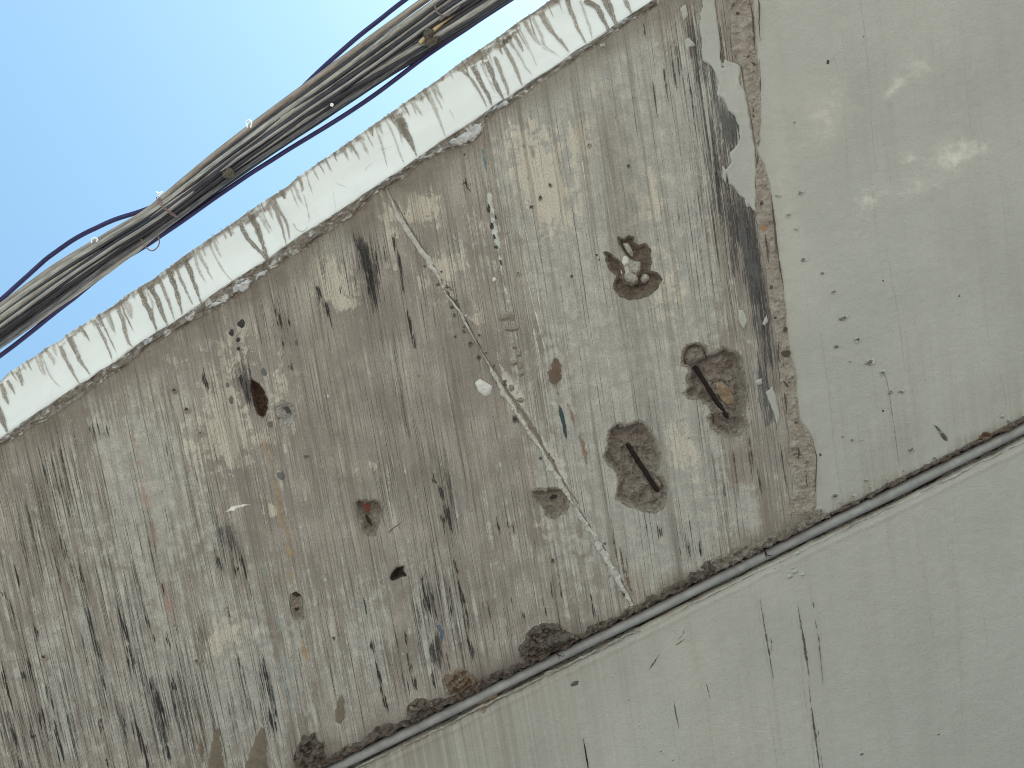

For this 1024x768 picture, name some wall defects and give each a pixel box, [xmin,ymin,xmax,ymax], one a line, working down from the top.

peeling [680,0,756,212]
spalling [0,0,663,446]
water stain [712,138,766,343]
water stain [0,296,133,432]
water stain [226,370,251,408]
crack [351,188,1024,768]
spalling [681,342,780,437]
spalling [291,592,304,622]
spalling [320,415,1024,768]